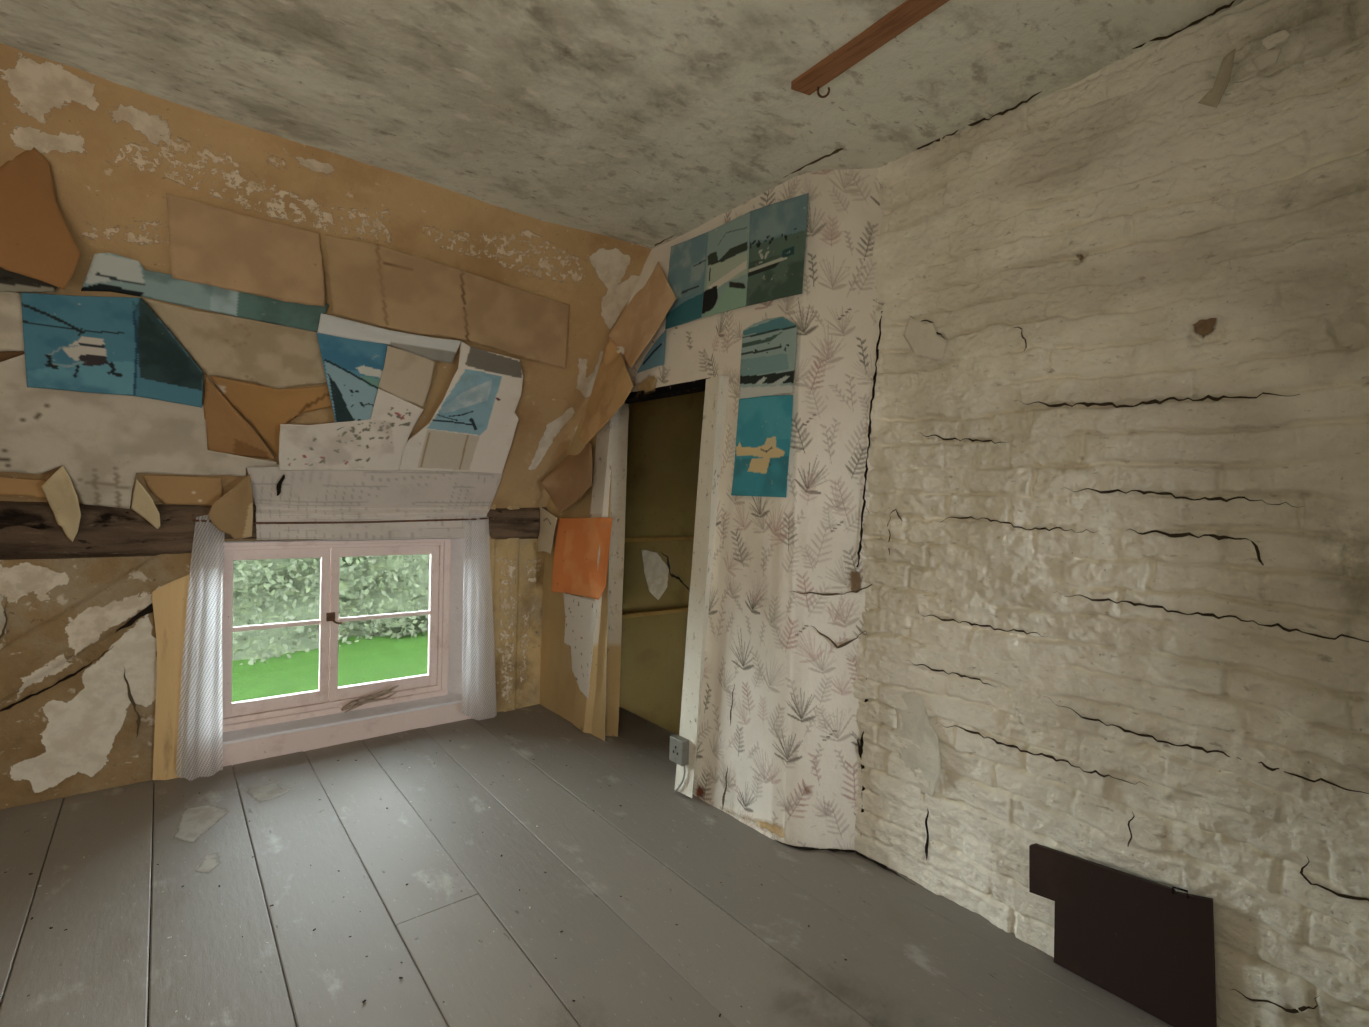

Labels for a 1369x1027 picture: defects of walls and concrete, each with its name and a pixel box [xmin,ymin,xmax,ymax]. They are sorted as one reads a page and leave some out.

crack [1133,0,1236,49]
peeling [0,52,391,245]
crack [917,91,1042,150]
peeling [528,351,604,470]
crack [790,311,1303,649]
flaking render [0,562,69,635]
flaking render [642,550,669,600]
flaking render [10,586,162,793]